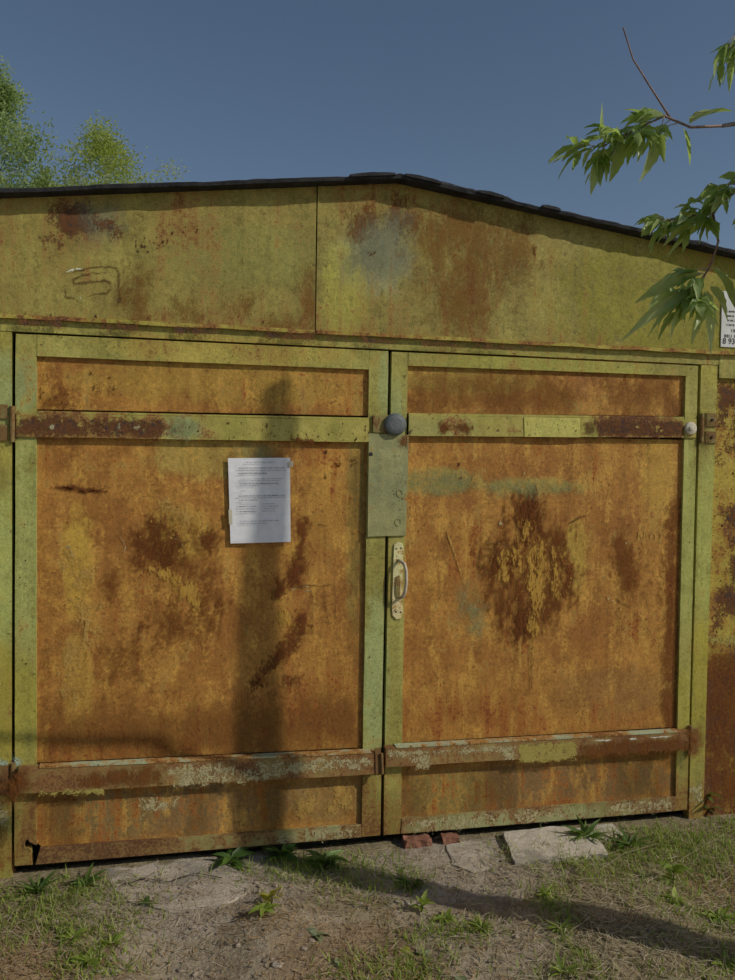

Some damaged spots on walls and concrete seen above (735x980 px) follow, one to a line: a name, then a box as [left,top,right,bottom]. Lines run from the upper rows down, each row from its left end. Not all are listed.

rust [39,198,123,258]
rust [86,515,240,694]
rust [271,516,314,600]
rust [473,484,587,689]
rust [249,610,317,700]
peeling [166,756,373,789]
peeling [387,741,518,771]